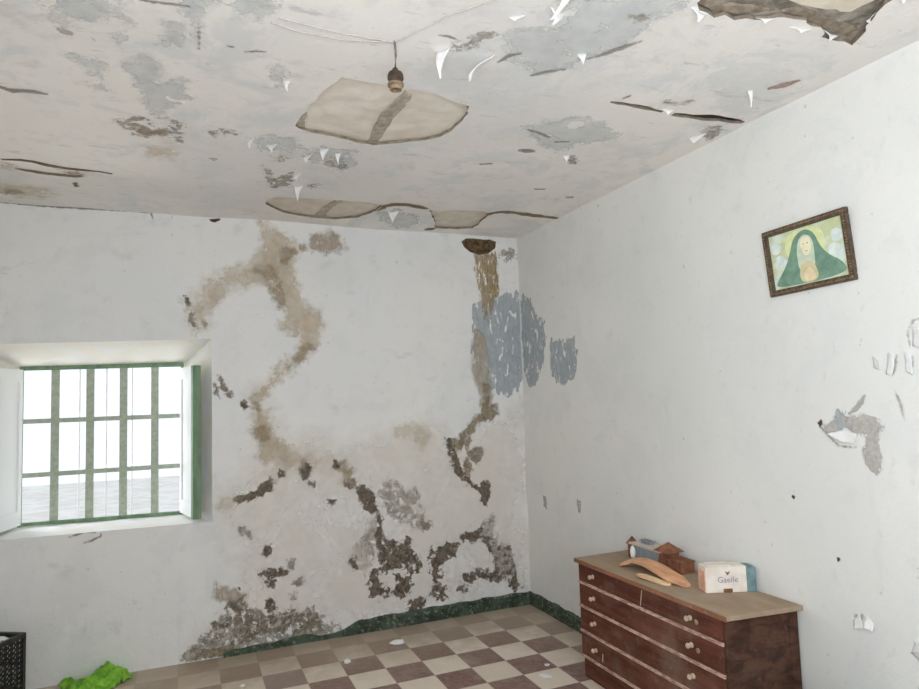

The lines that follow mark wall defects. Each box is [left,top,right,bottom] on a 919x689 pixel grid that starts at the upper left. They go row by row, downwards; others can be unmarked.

peeling [436,32,494,79]
peeling [469,0,885,82]
crack [16,161,83,178]
peeling [117,56,191,143]
flaking render [296,77,468,143]
peeling [518,117,619,164]
crack [623,80,800,144]
water stain [232,230,342,401]
peeling [471,290,578,398]
water stain [255,413,313,466]
peeling [817,396,882,475]
flaking render [180,543,341,662]